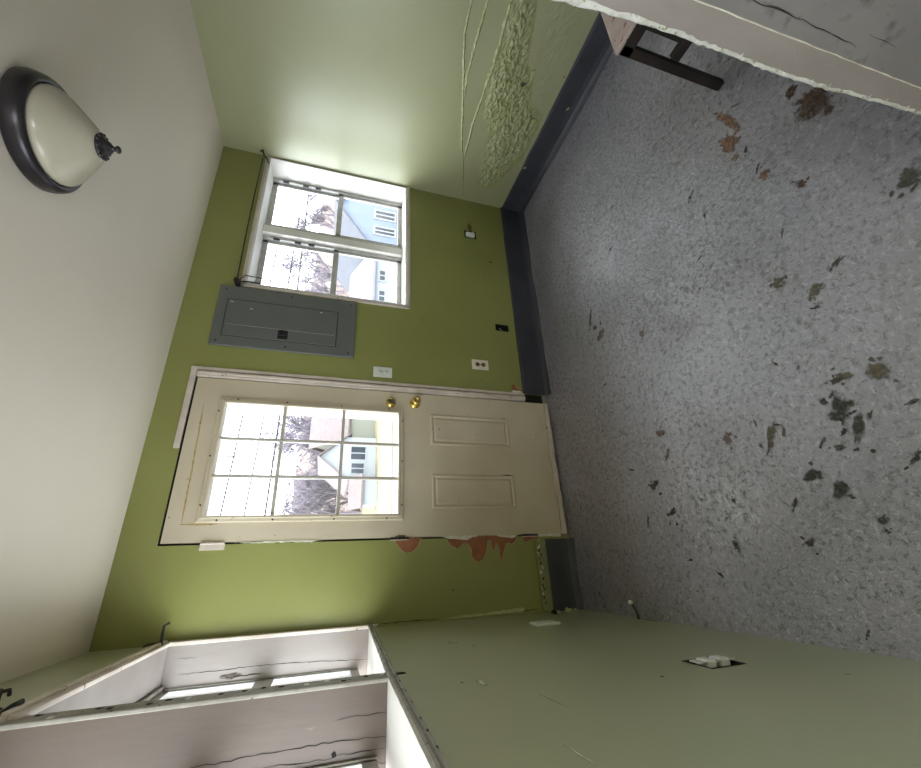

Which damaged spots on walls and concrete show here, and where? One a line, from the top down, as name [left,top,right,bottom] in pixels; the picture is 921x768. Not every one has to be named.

crack [461,0,489,196]
peeling [443,533,577,615]